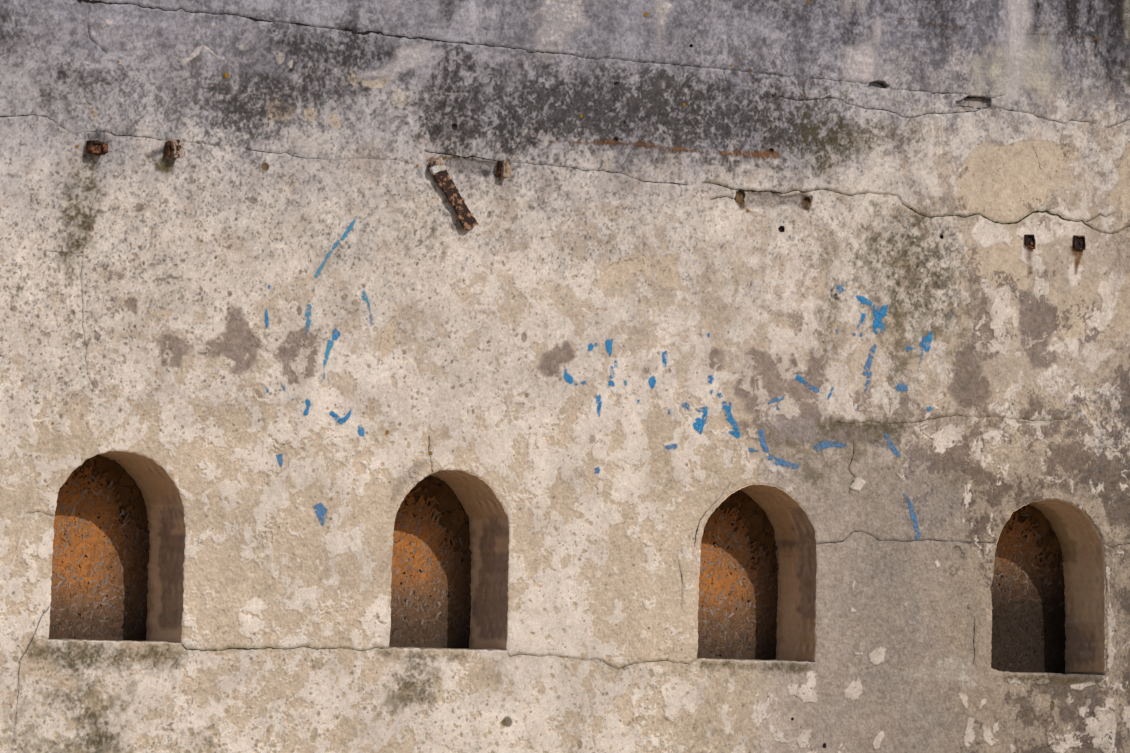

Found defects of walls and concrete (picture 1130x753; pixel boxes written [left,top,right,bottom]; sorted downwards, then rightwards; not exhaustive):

leakage [213,28,428,126]
crack [78,0,1129,128]
leakage [415,0,853,168]
leakage [845,25,880,80]
leakage [973,0,1052,100]
leakage [1065,0,1130,85]
corrosion [594,139,655,147]
crack [404,151,1130,234]
corrosion [1071,247,1082,274]
peeling [1041,488,1114,542]
peeling [1047,566,1130,753]